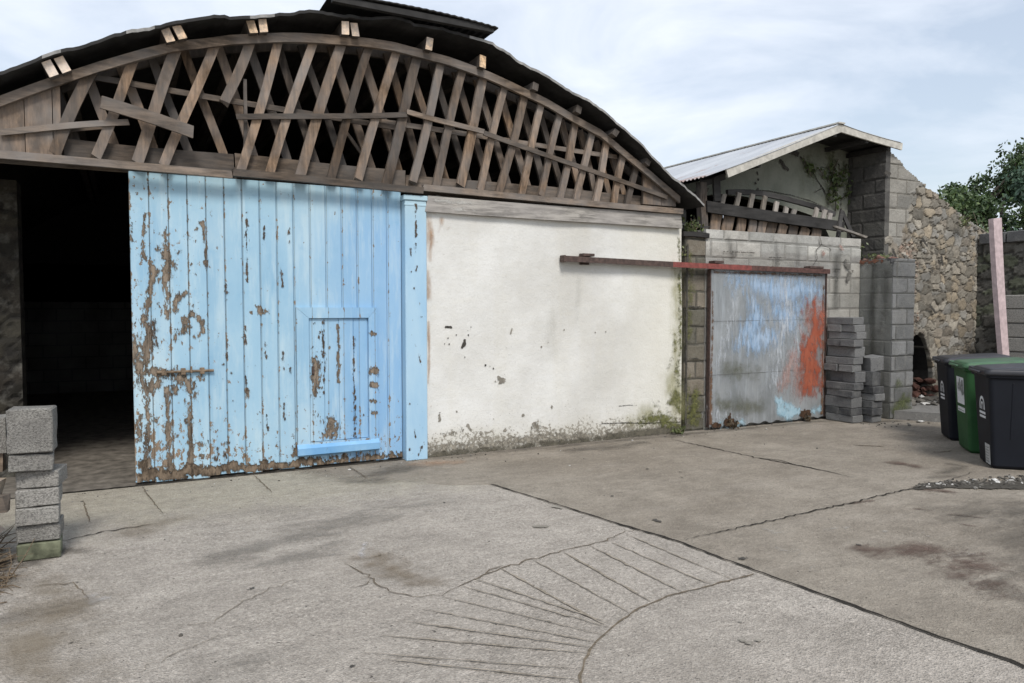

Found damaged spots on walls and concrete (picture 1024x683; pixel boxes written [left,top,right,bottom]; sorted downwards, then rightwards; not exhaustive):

rust [714,271,824,326]
peeling [130,213,231,473]
peeling [309,320,379,440]
water stain [428,375,690,458]
crack [686,472,970,540]
crack [345,563,441,597]